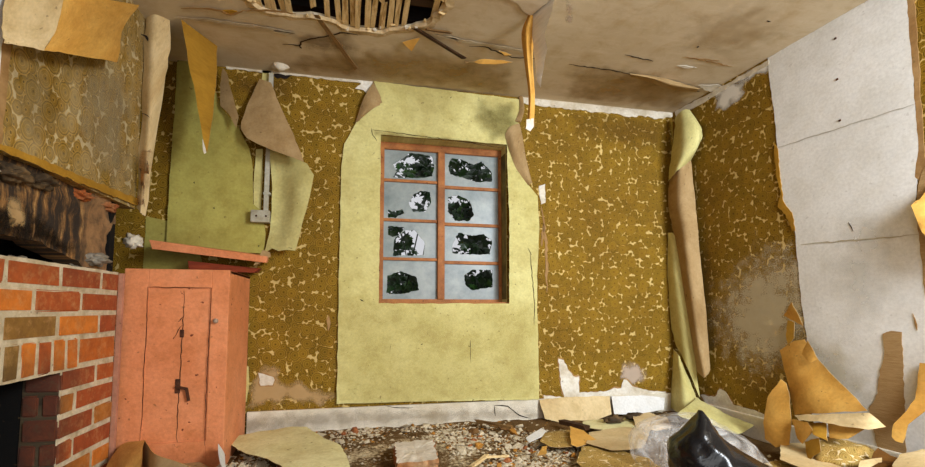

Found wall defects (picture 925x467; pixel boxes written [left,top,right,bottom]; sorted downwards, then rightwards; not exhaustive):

flaking render [181,0,455,37]
crack [283,32,357,49]
peeling [0,0,139,144]
peeling [181,20,304,162]
flaking render [355,80,373,93]
peeling [137,14,171,216]
peeling [911,193,925,235]
spalling [121,233,144,249]
leakage [720,249,802,375]
flaking render [542,357,667,399]